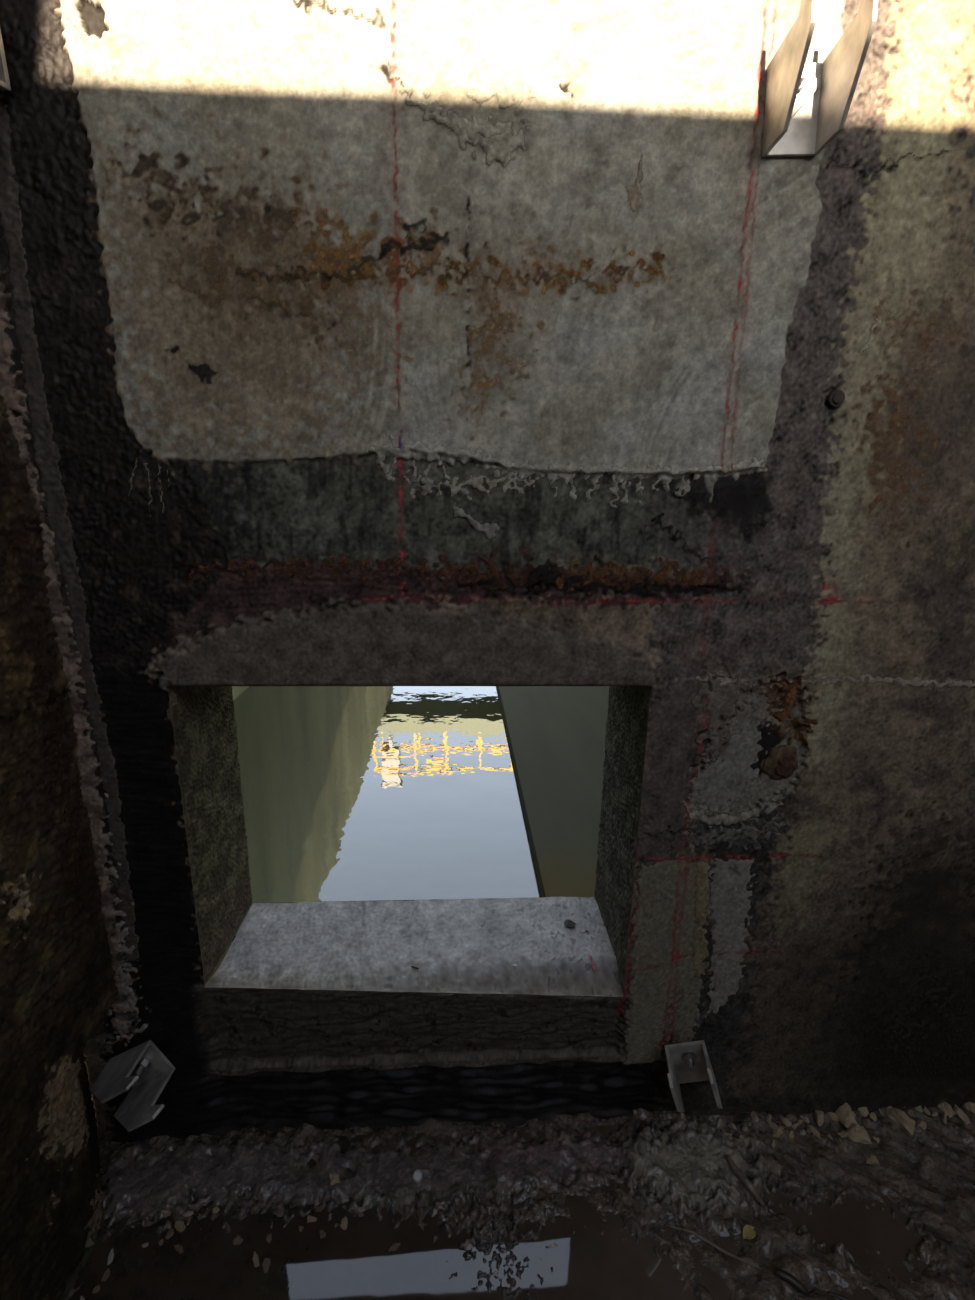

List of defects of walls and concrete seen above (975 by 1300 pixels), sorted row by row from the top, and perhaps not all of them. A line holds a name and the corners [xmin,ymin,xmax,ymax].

rust [112,154,672,350]
rust [183,546,748,599]
spalling [679,665,818,978]